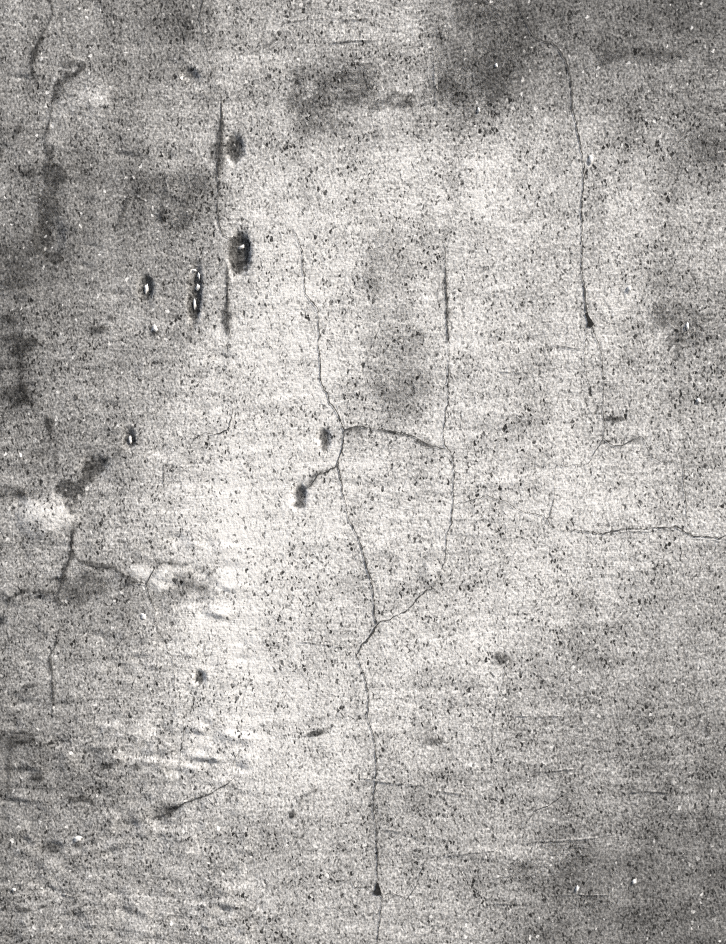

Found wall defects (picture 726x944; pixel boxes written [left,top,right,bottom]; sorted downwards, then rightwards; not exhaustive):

crack [29,0,53,80]
water stain [437,74,469,102]
crack [41,100,57,232]
crack [296,0,726,944]
crack [7,493,250,820]